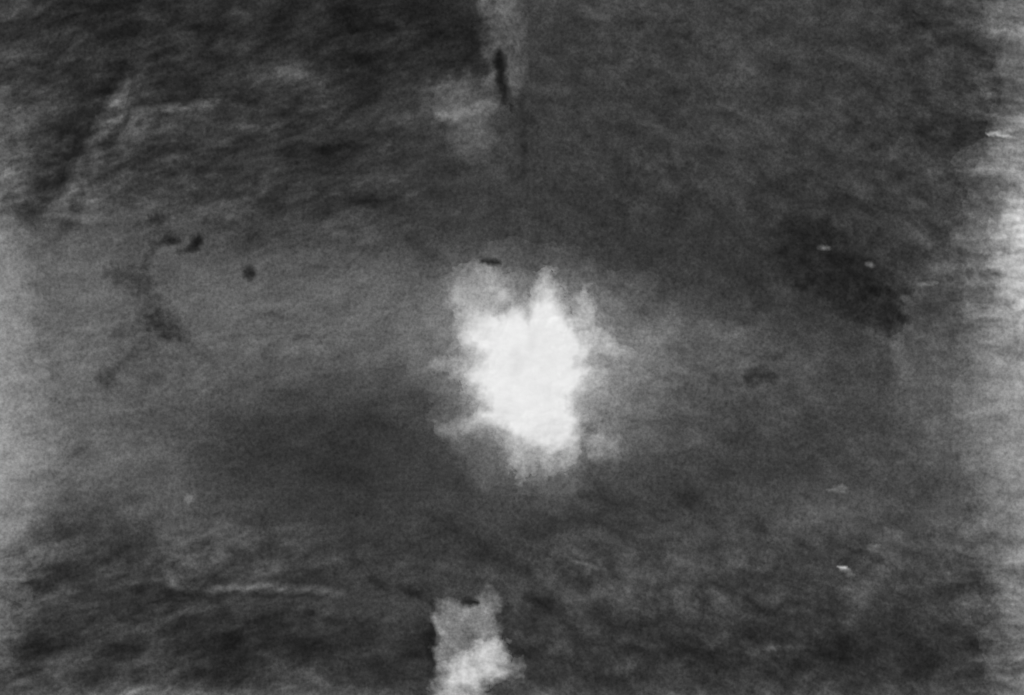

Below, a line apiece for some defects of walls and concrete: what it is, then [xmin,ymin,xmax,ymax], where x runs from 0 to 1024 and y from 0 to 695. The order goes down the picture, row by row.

crack [493,48,529,180]
peeling [406,236,687,503]
spalling [460,596,481,609]